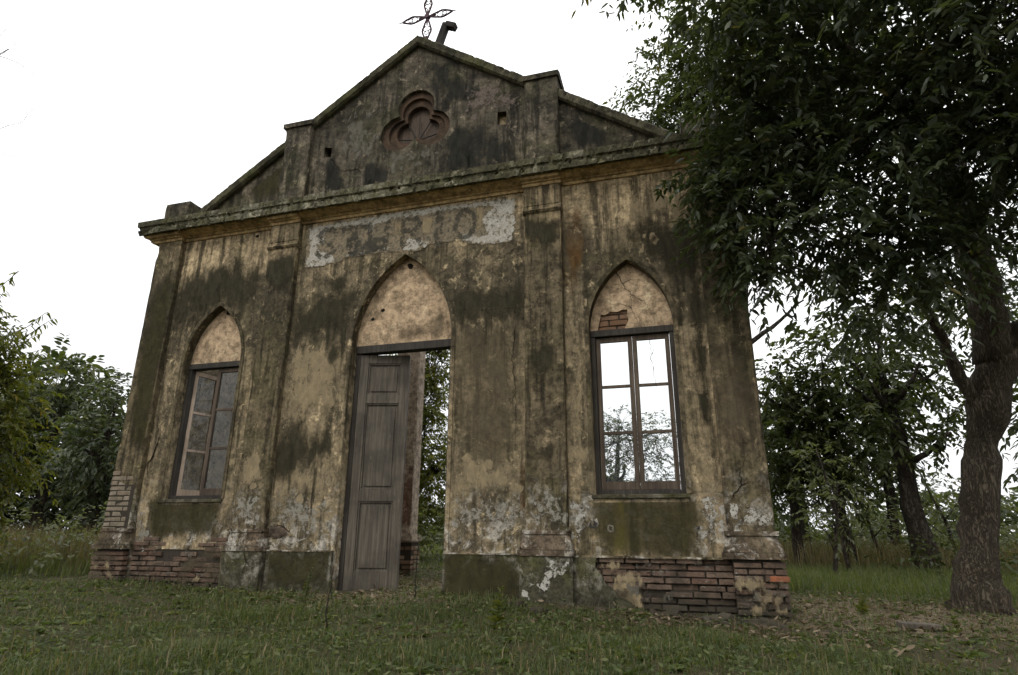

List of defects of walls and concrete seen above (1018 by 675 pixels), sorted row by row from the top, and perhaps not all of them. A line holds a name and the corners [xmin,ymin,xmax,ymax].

leakage [443,126,509,171]
leakage [324,157,344,192]
leakage [363,162,387,186]
flaking render [598,310,628,331]
leakage [275,423,336,515]
peeling [695,453,773,539]
flaking render [88,471,229,587]
peeling [522,560,569,601]
flaking render [596,558,793,622]